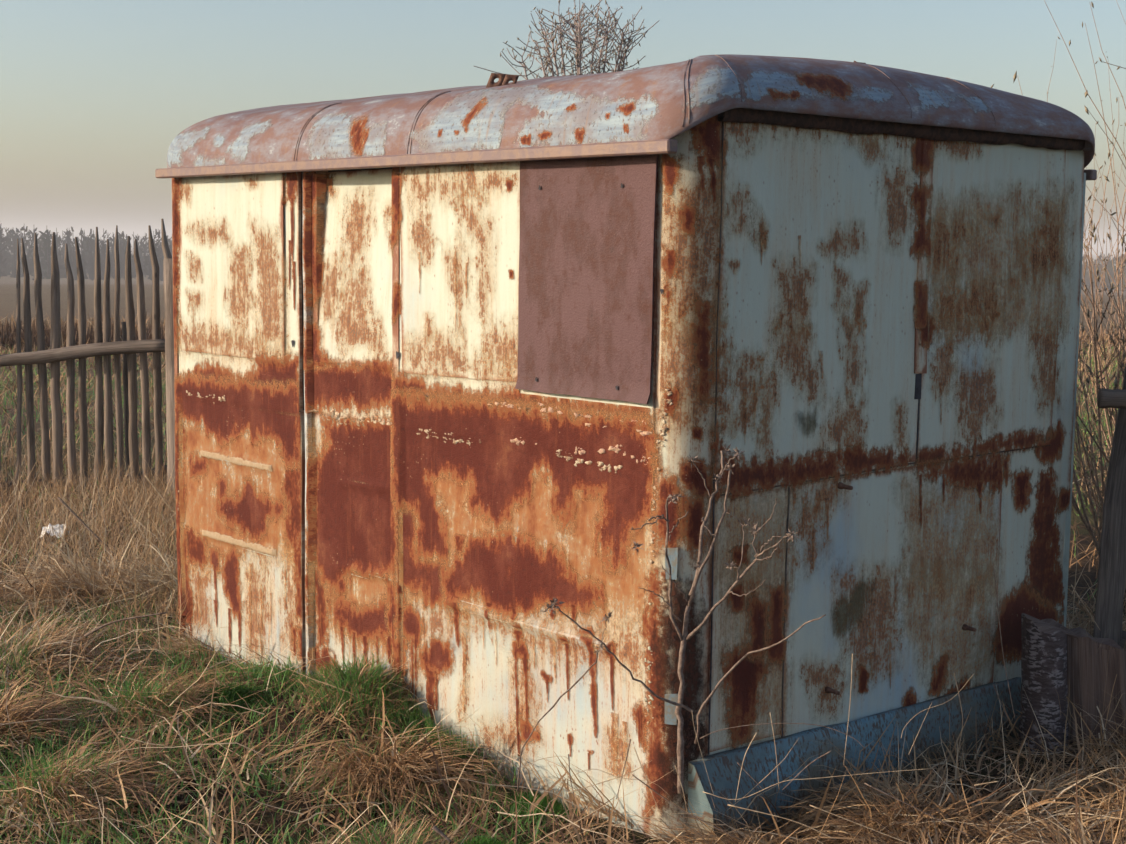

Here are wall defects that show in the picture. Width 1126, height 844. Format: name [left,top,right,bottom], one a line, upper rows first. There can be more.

corrosion [767,72,853,101]
corrosion [437,98,487,137]
corrosion [605,102,636,134]
peeling [416,429,481,448]
corrosion [172,115,1074,819]